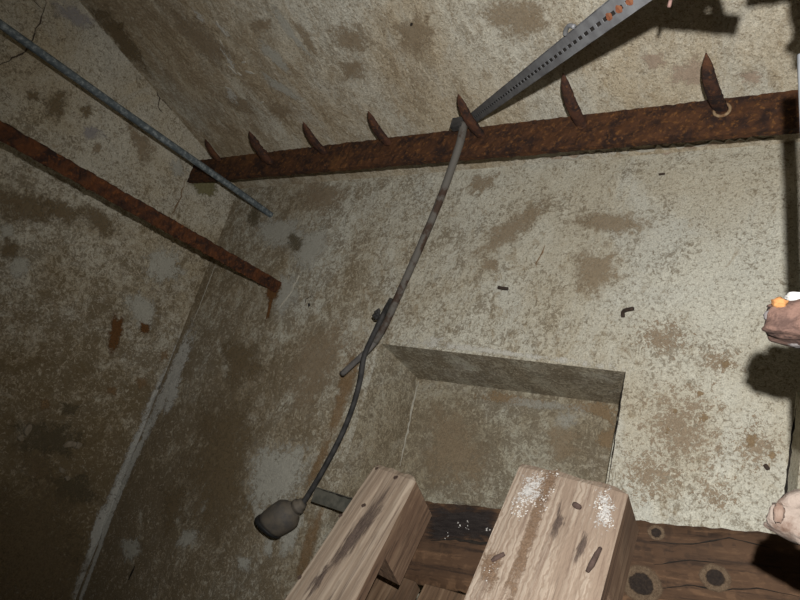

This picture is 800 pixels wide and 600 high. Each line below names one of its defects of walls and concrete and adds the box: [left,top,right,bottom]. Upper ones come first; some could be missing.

crack [0,0,47,65]
corrosion [0,121,282,321]
corrosion [108,315,123,353]
water stain [72,330,194,600]
water stain [163,401,309,547]
water stain [264,516,304,557]